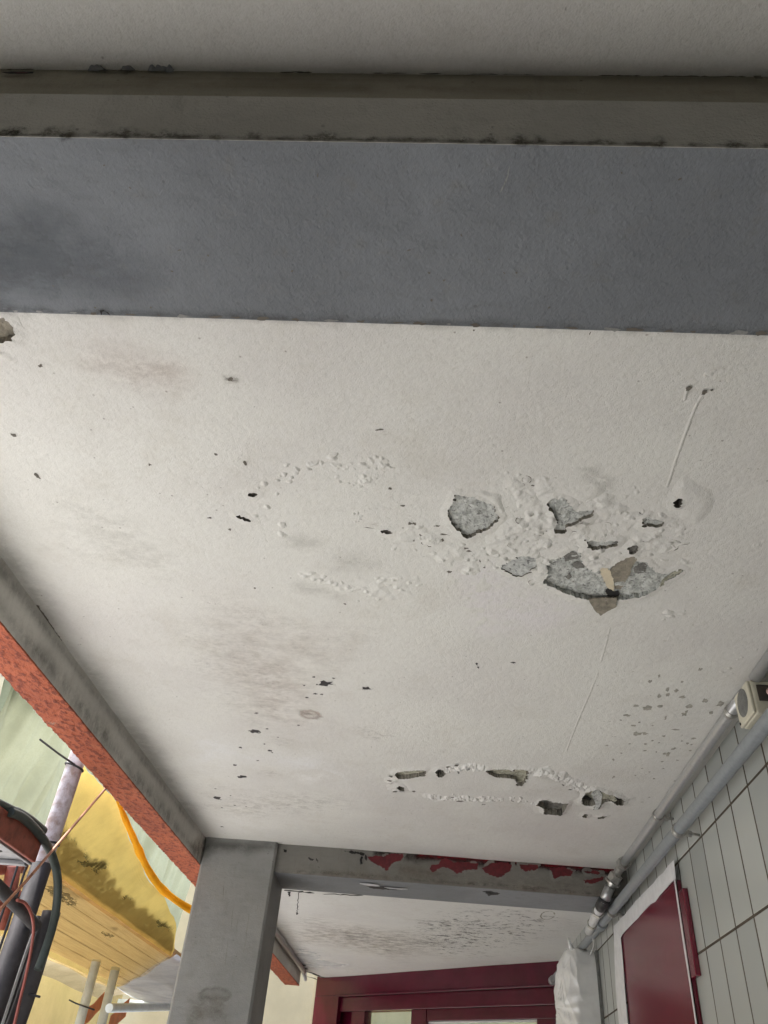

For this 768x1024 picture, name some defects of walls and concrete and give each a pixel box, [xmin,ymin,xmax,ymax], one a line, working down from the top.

crack [665,388,704,488]
spalling [408,483,693,616]
spalling [384,764,448,793]
spalling [484,763,539,787]
spalling [527,776,651,819]
peeling [368,853,407,871]
peeling [430,858,607,896]